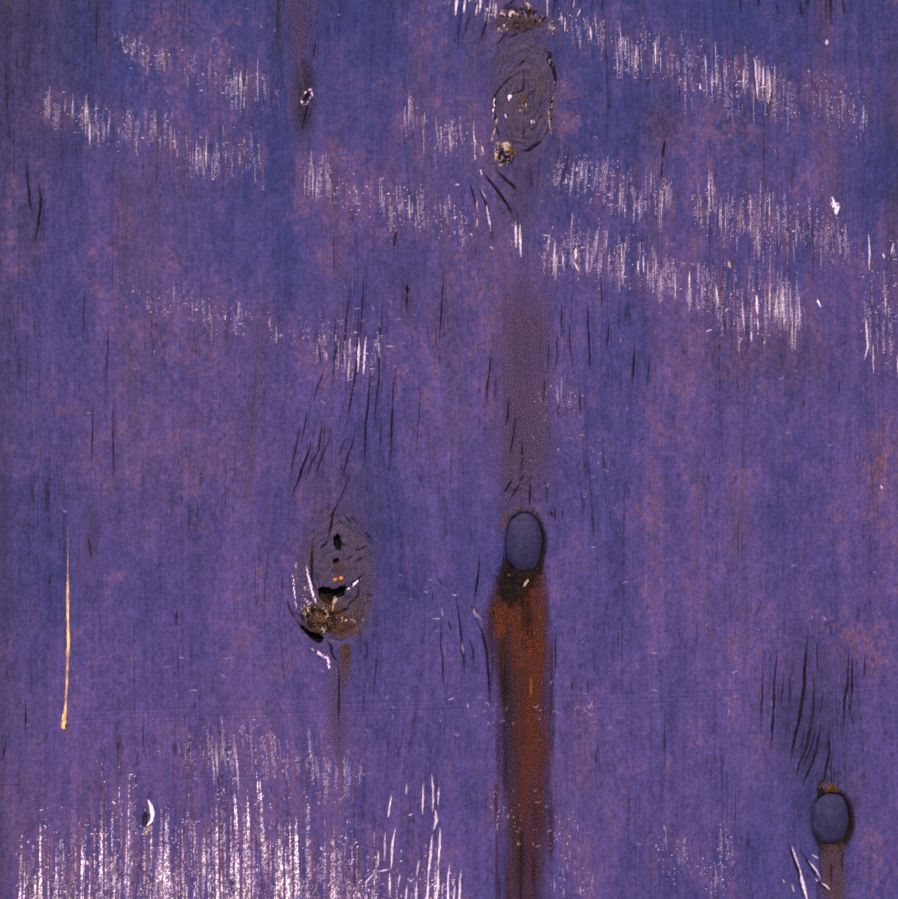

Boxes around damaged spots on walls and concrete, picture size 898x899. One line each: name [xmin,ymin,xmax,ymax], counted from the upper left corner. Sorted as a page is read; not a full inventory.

corrosion [490,568,552,899]
crack [761,647,832,784]
crack [843,661,865,712]
peeling [143,800,195,898]
peeling [202,798,255,899]
peeling [274,826,310,899]